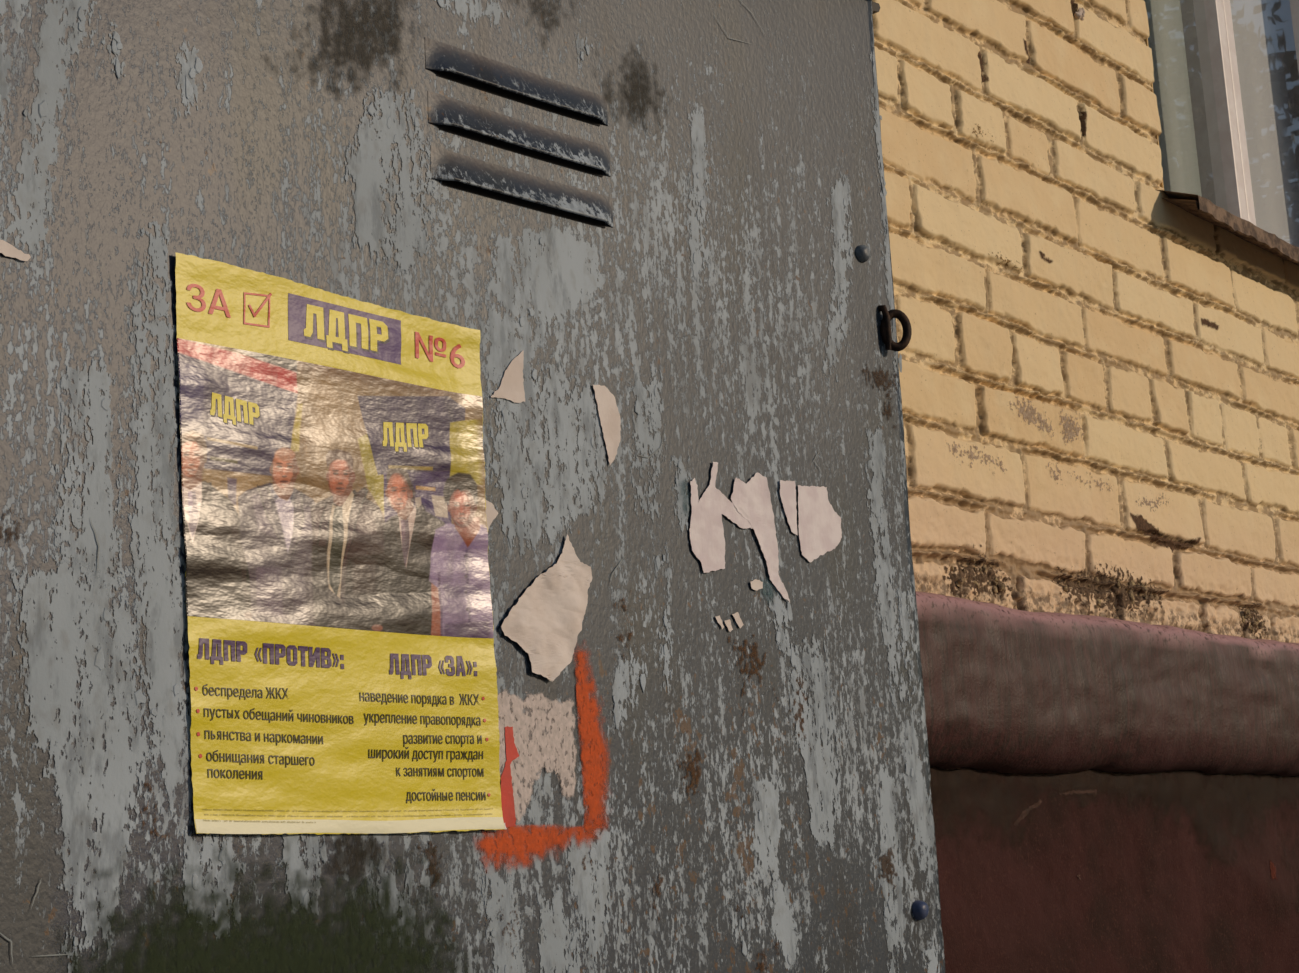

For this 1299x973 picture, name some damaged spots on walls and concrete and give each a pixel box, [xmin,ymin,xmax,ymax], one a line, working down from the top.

peeling [474,219,607,556]
rust [860,360,898,428]
peeling [9,216,191,973]
peeling [481,826,619,973]
rust [647,874,663,920]
rust [674,748,706,804]
rust [728,634,808,740]
peeling [752,769,802,972]
peeling [768,584,842,851]
rust [878,844,898,889]
peeling [865,426,940,973]
water stain [930,766,1299,851]